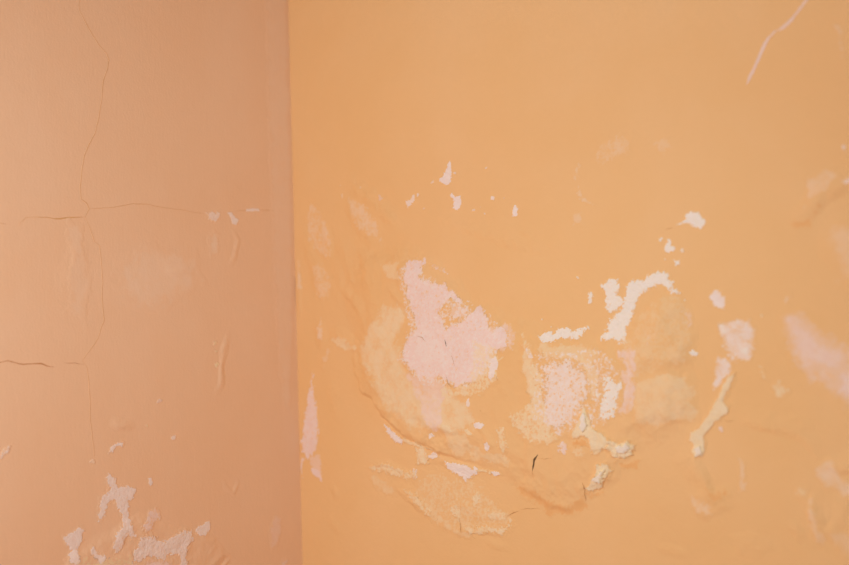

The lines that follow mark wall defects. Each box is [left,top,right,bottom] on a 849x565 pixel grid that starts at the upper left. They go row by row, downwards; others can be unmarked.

crack [0,0,202,396]
peeling [431,160,463,213]
peeling [658,237,685,267]
spalling [300,369,324,482]
spalling [383,250,639,493]
peeling [686,288,759,461]
peeling [61,471,212,565]